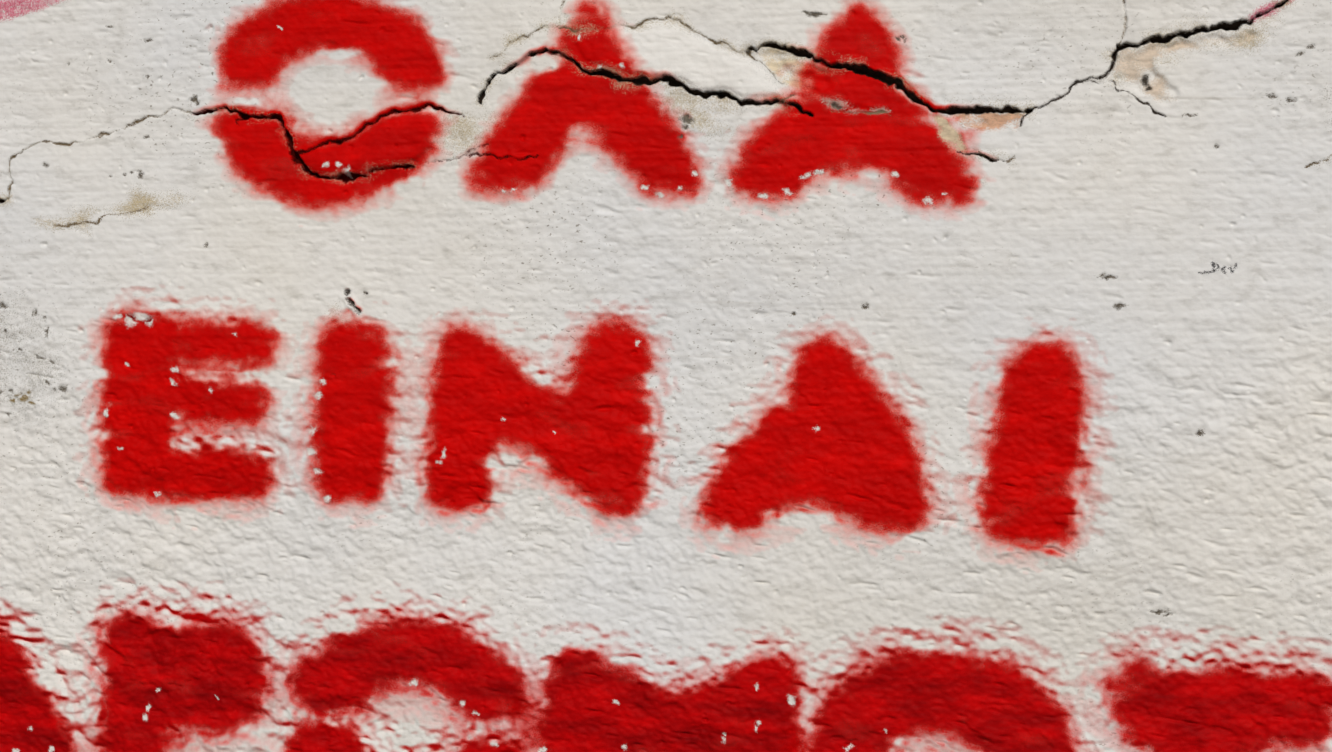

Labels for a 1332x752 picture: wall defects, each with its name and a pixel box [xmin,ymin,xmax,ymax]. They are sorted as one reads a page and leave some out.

crack [0,0,1296,208]
crack [53,206,149,228]